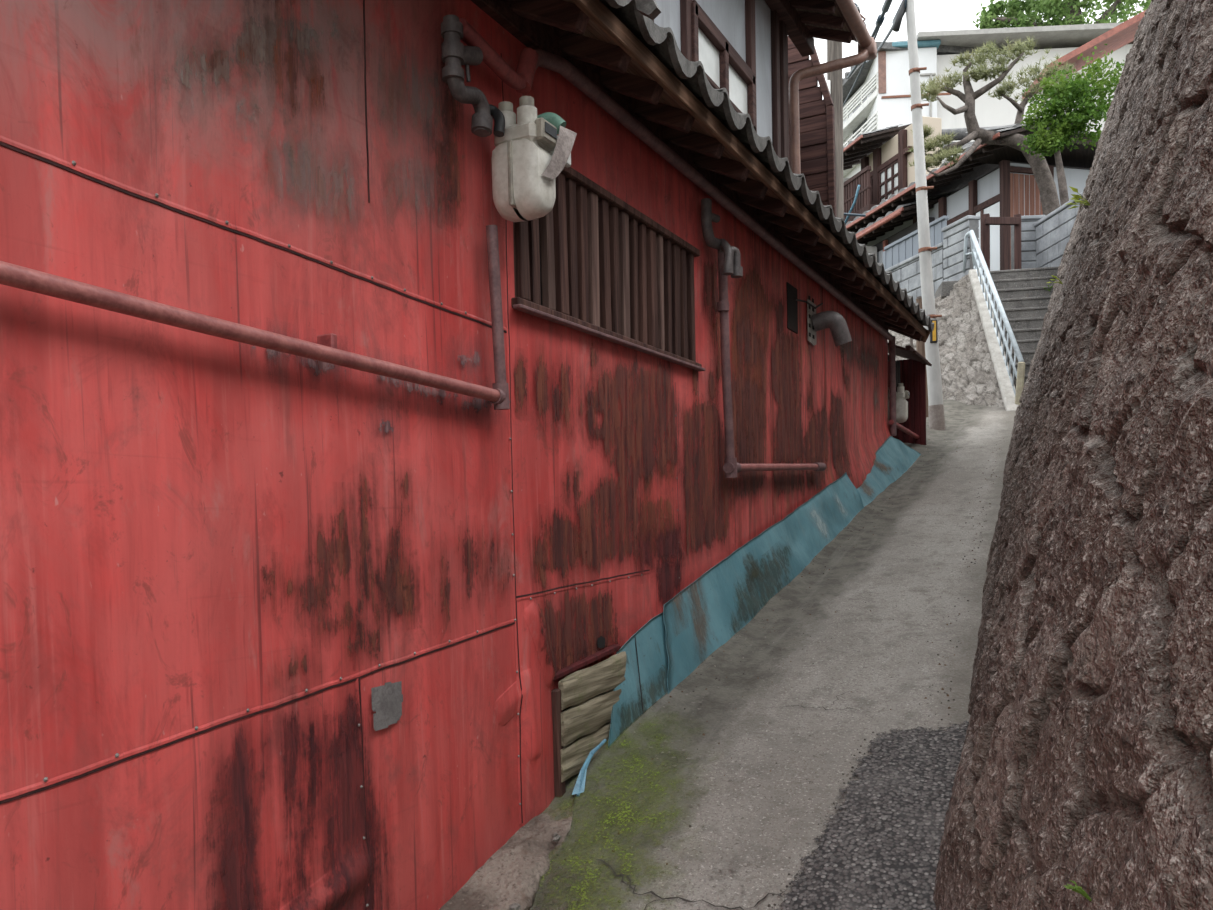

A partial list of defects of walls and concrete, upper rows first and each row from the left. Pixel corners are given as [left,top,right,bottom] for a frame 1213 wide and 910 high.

rust [206,725,264,910]
rust [279,689,388,910]